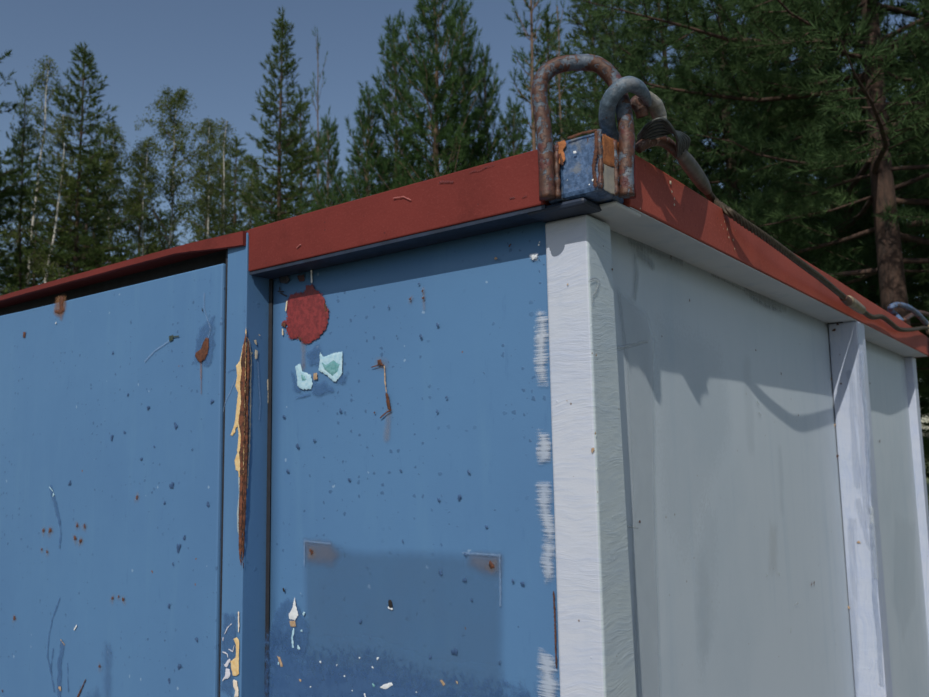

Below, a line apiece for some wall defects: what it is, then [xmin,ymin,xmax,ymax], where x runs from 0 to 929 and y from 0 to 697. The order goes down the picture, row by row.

corrosion [558,129,619,195]
peeling [293,347,345,397]
peeling [221,611,239,697]
peeling [264,598,530,697]